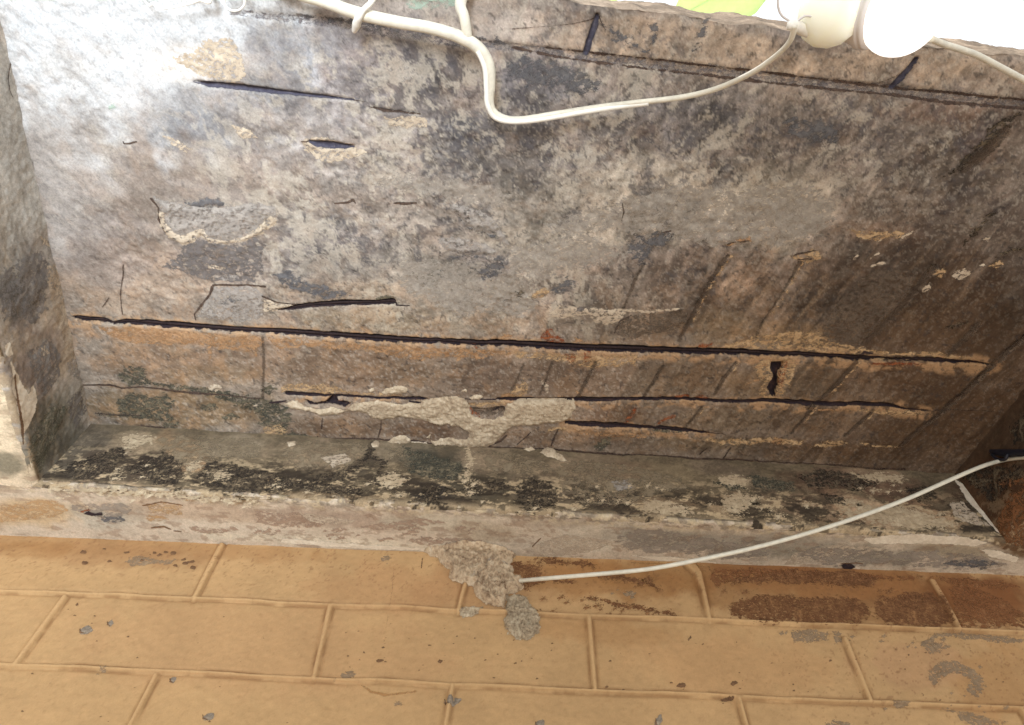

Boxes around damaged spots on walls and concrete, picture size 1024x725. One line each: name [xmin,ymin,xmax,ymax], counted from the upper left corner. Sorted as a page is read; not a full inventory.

crack [193,80,421,114]
crack [75,264,987,365]
corrosion [100,326,637,371]
hole [767,361,783,396]
corrosion [698,330,972,398]
spalling [307,395,351,407]
hole [469,400,506,417]
crack [465,396,995,470]
corrosion [700,430,848,447]
mould [61,442,467,506]
mould [487,478,558,511]
water stain [72,503,131,523]